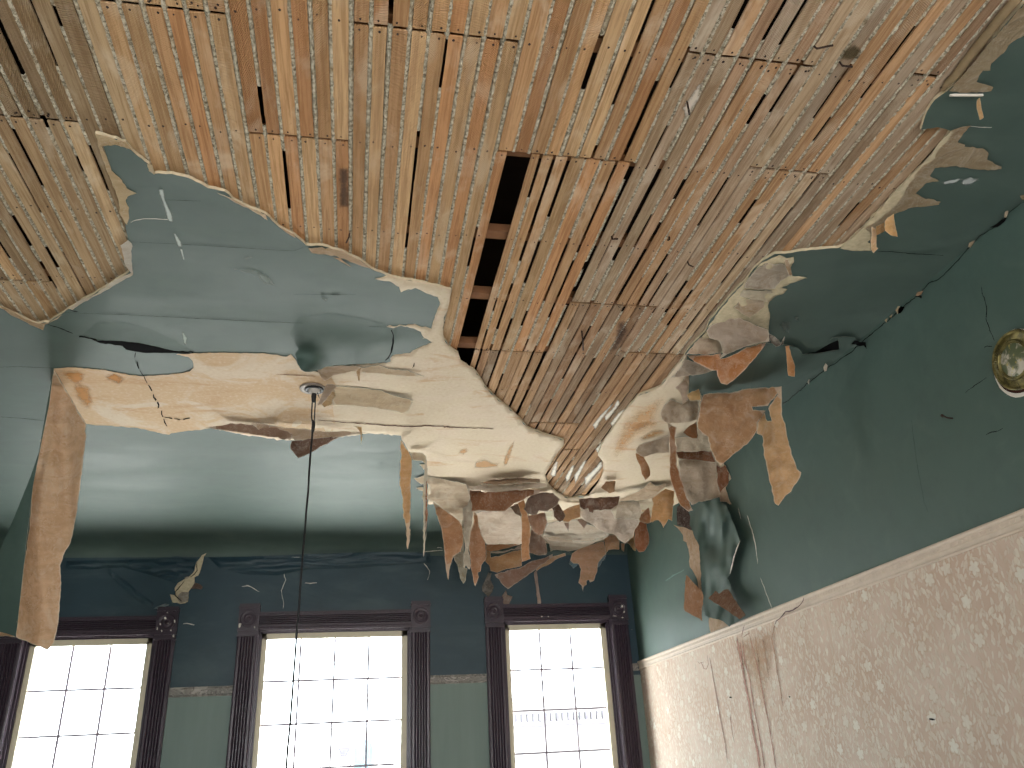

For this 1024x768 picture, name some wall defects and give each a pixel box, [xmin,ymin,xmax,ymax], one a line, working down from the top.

flaking render [841,131,953,251]
spalling [120,240,133,273]
flaking render [701,255,806,347]
crack [782,195,1024,404]
crack [135,352,190,426]
flaking render [54,275,703,544]
spalling [994,375,1024,398]
flaking render [156,553,206,637]
damp [737,627,783,768]